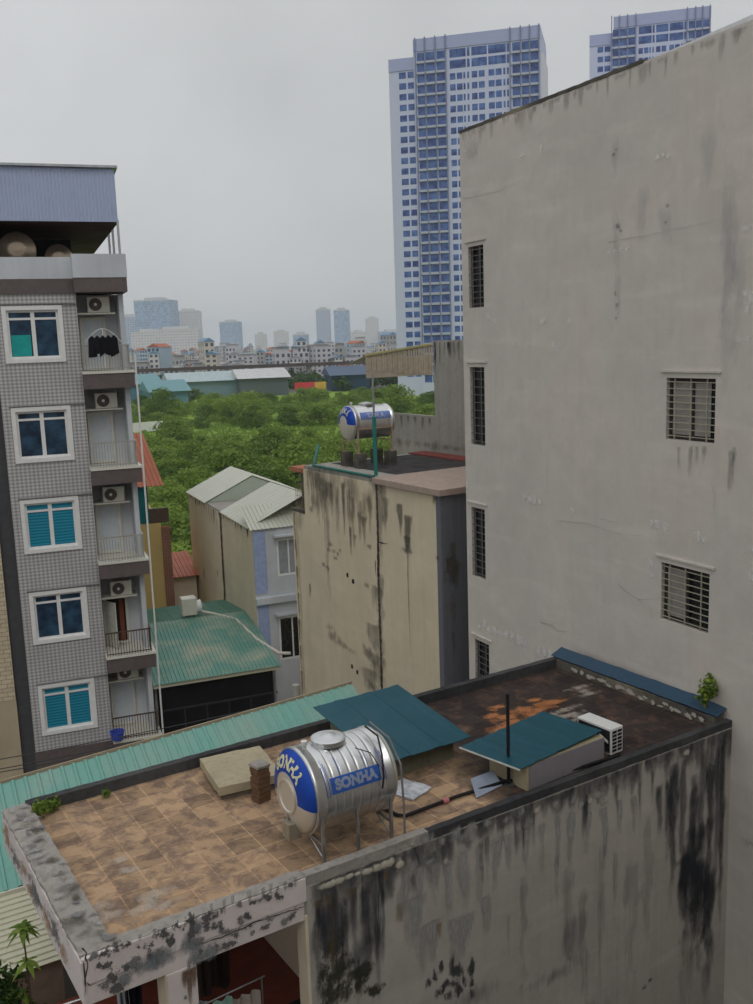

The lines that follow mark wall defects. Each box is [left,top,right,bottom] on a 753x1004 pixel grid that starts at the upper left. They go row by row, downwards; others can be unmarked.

water stain [397,504,410,550]
peeling [1,804,296,995]
water stain [315,729,732,1004]